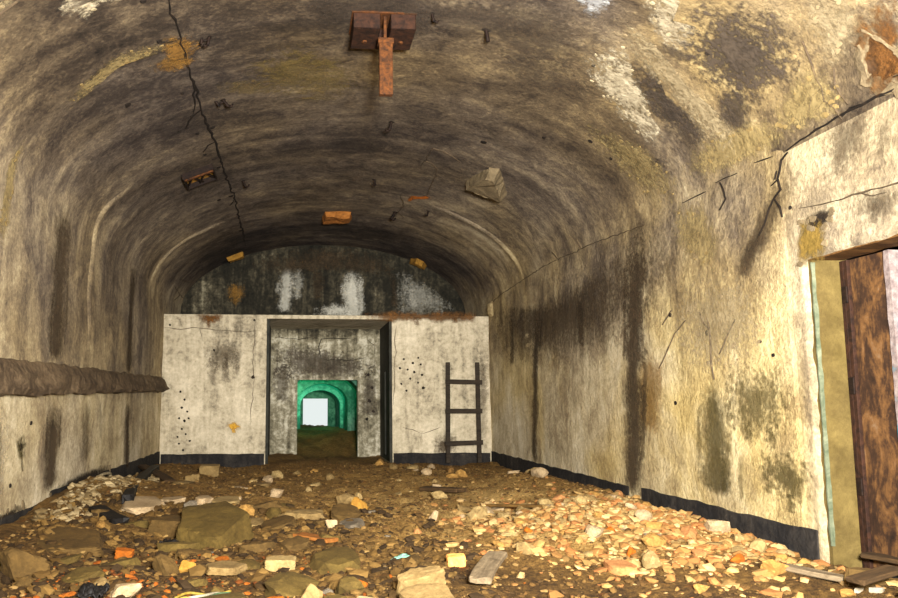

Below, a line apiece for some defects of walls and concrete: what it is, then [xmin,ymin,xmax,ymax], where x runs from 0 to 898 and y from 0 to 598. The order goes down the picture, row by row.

rust [165,36,212,67]
crack [158,0,245,242]
water stain [664,3,800,128]
crack [683,41,898,236]
spalling [807,0,898,99]
water stain [49,218,70,356]
water stain [278,251,374,315]
water stain [495,234,653,490]
water stain [703,374,785,492]
water stain [759,455,806,503]